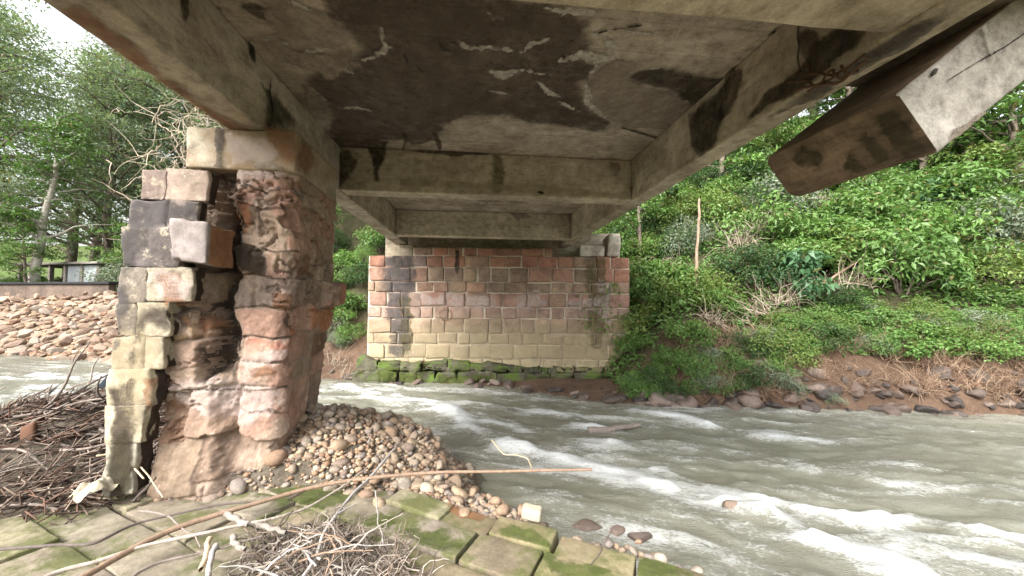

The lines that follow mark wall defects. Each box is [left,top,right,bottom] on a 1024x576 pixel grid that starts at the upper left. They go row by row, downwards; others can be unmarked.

water stain [273,0,617,190]
water stain [630,65,742,156]
crack [949,33,1024,80]